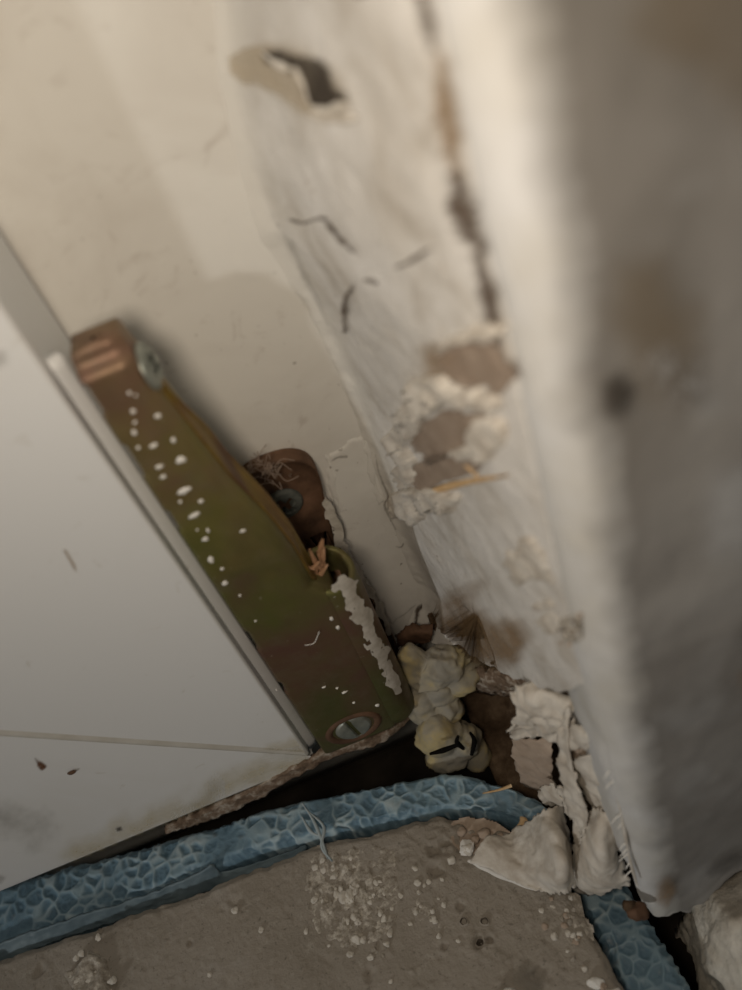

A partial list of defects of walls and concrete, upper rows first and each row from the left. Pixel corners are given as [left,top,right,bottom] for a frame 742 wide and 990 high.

spalling [231,47,359,125]
peeling [325,317,518,648]
spalling [554,613,584,647]
peeling [447,665,638,967]
peeling [586,977,620,990]